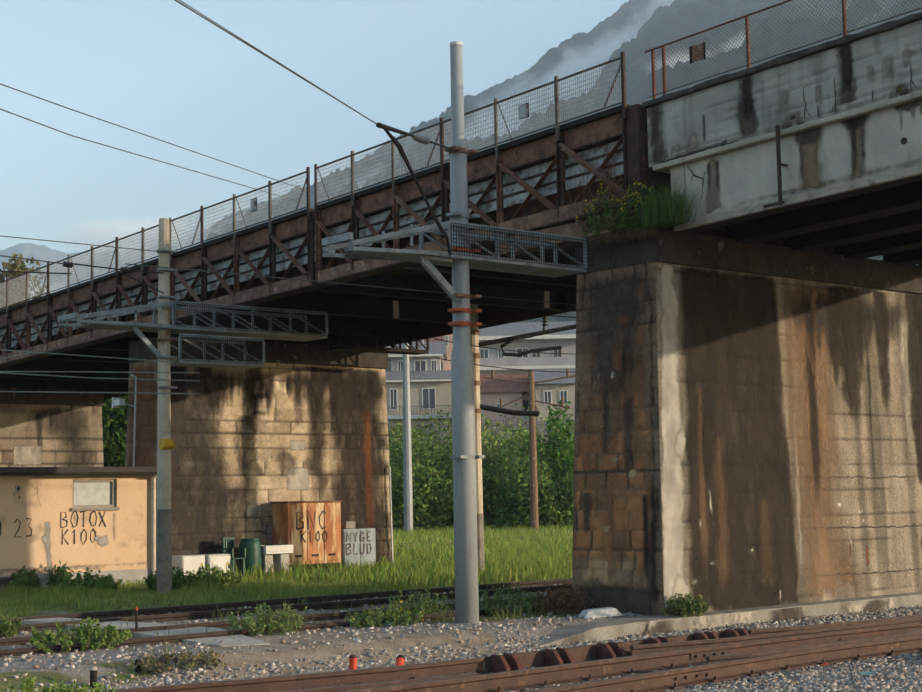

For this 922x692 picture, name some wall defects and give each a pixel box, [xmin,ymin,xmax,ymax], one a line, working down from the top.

leakage [737,74,758,137]
leakage [795,127,821,189]
leakage [836,43,865,177]
leakage [170,361,391,566]
corrosion [574,370,650,585]
leakage [681,268,922,621]